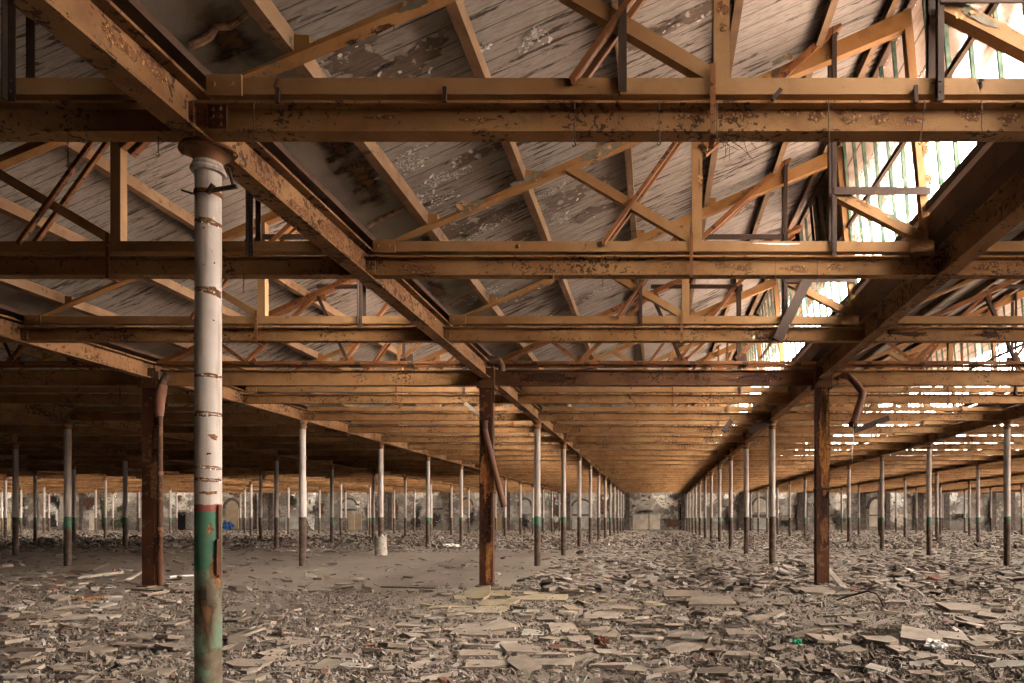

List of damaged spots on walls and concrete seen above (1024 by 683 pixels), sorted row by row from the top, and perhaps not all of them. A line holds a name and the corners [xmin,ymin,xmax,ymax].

peeling [321,23,449,78]
water stain [318,142,384,205]
peeling [391,142,525,241]
rust [150,419,159,499]
rust [479,445,495,585]
rust [818,388,831,546]